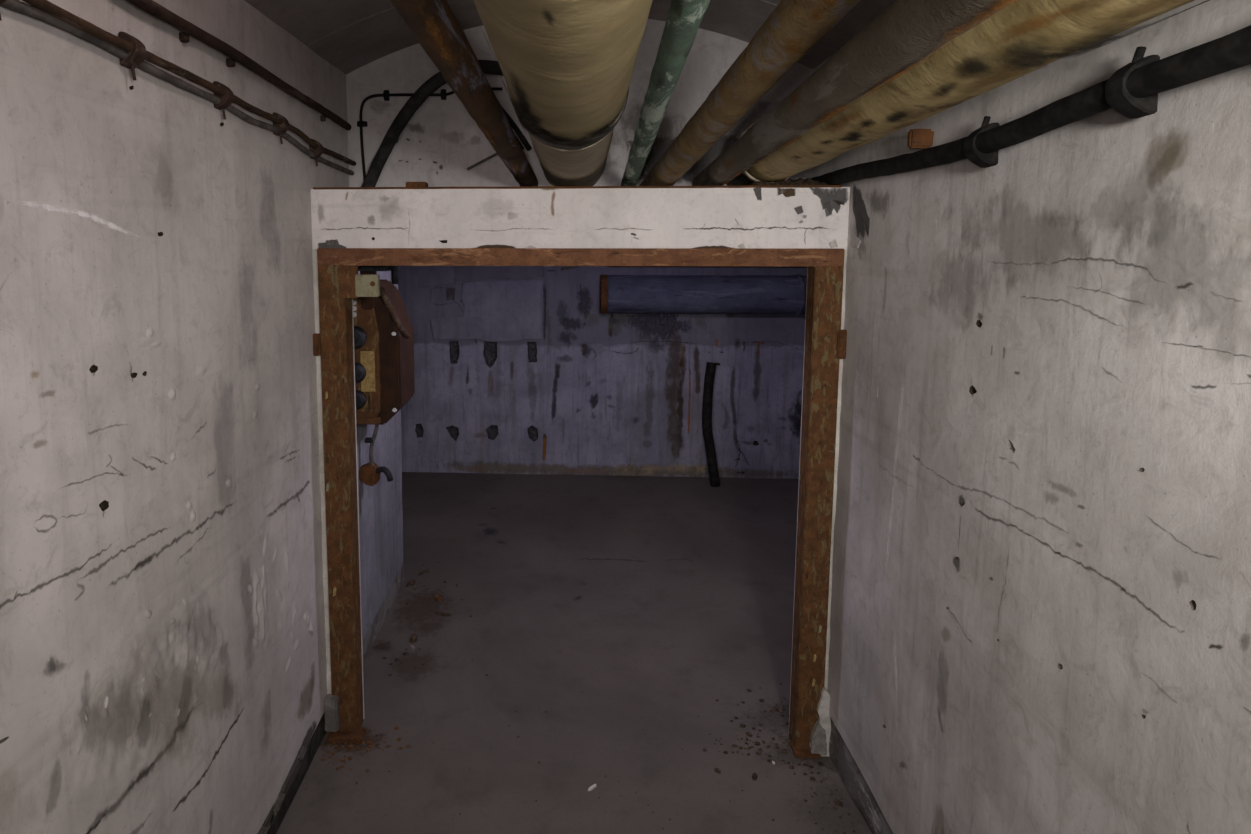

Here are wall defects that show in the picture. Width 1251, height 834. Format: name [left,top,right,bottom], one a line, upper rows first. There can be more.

spalling [778,188,803,214]
spalling [810,186,870,248]
crack [0,550,103,608]
crack [131,510,224,572]
crack [976,509,1165,622]
crack [174,715,240,810]